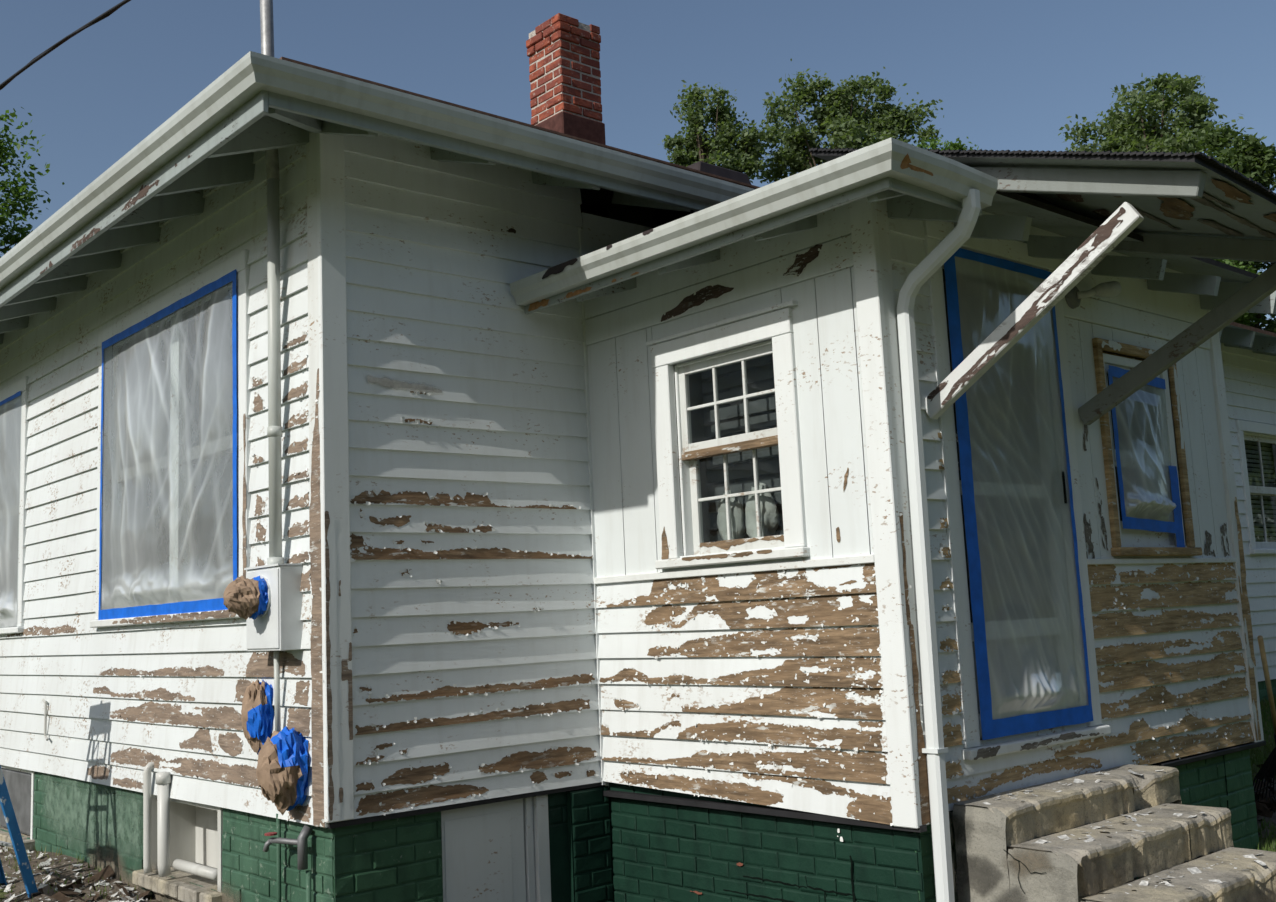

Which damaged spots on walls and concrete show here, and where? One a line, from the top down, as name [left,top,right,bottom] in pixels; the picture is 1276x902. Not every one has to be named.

peeling [542,258,578,279]
peeling [783,244,823,277]
peeling [528,287,592,311]
peeling [661,284,734,322]
peeling [927,179,1276,405]
peeling [87,332,893,837]
peeling [5,624,76,637]
peeling [939,478,1261,805]
peeling [899,512,931,825]
peeling [1033,808,1210,870]
peeling [1125,853,1266,899]